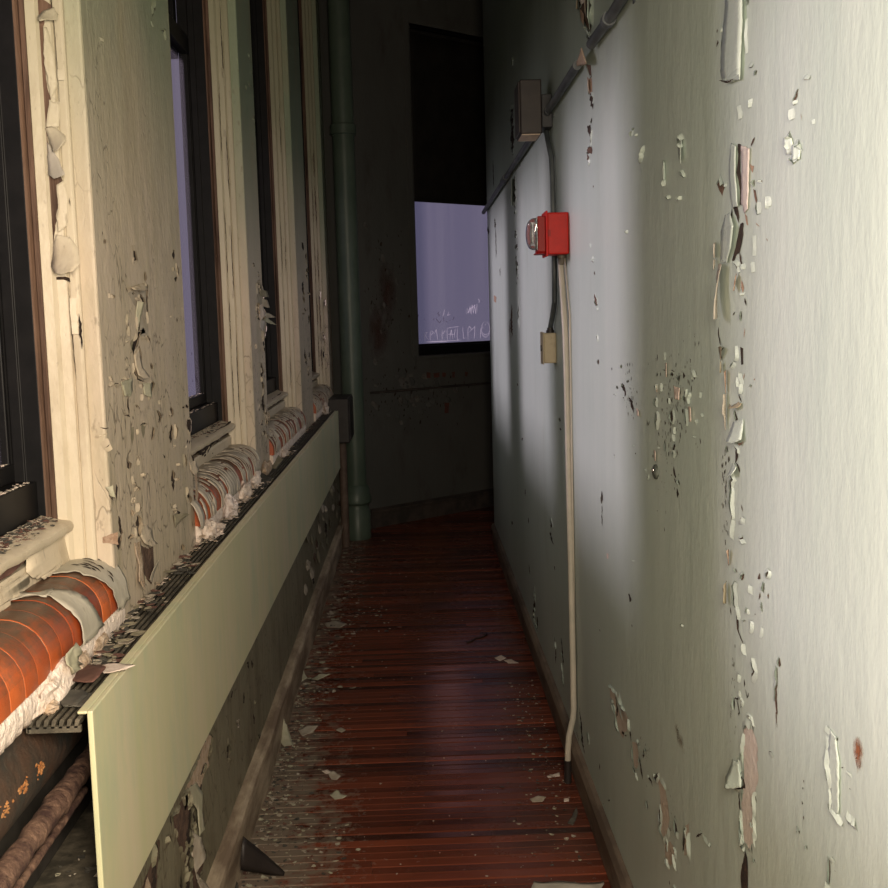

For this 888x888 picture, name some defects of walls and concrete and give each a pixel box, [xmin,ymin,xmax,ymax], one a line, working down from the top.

peeling [717,0,757,84]
peeling [38,0,83,380]
peeling [751,196,772,273]
peeling [125,273,155,401]
peeling [171,263,305,529]
peeling [611,352,704,497]
peeling [117,473,160,589]
rust [0,761,45,818]
peeling [165,733,213,888]
peeling [608,684,691,871]
peeling [739,712,758,863]
rust [854,740,862,769]